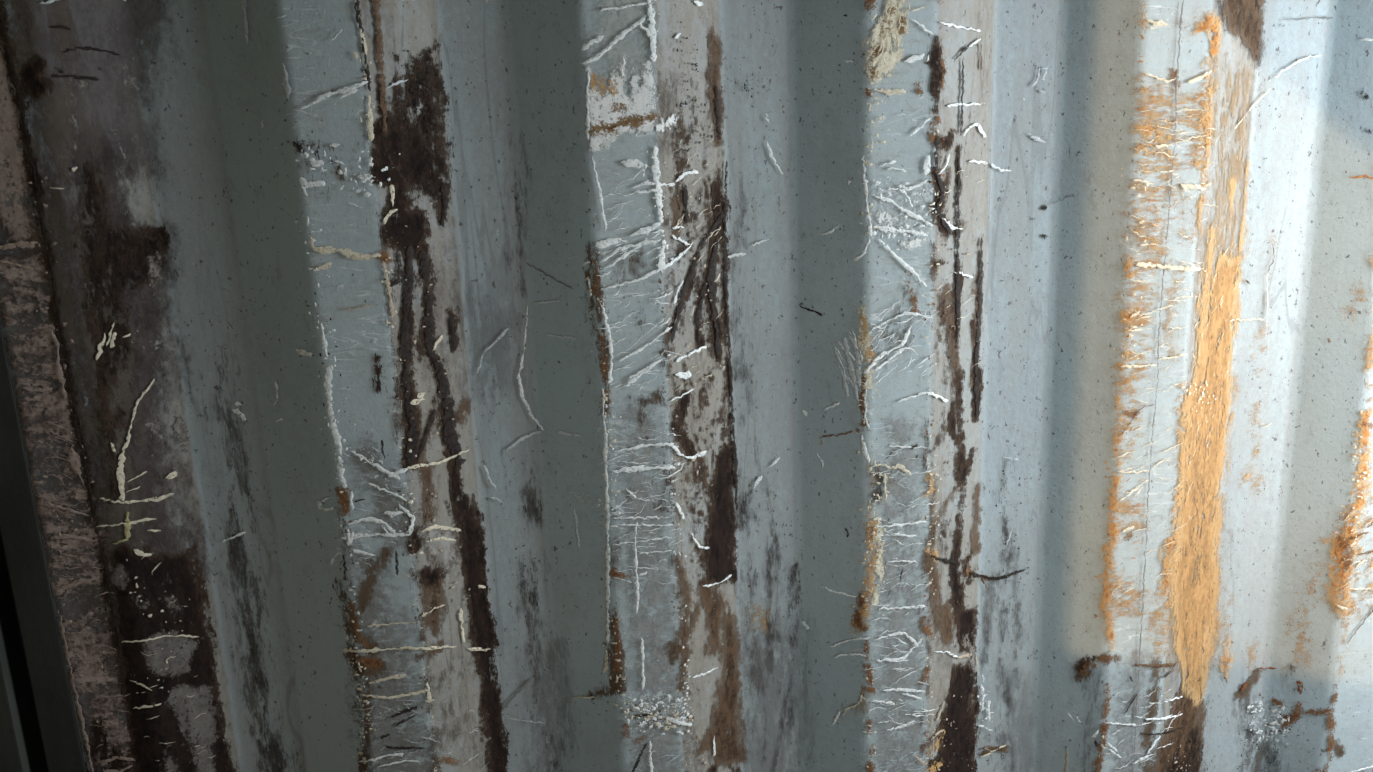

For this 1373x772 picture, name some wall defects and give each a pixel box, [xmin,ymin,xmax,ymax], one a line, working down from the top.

rust [50,141,237,772]
rust [317,456,354,518]
rust [335,0,510,772]
rust [573,157,641,702]
rust [629,21,747,772]
rust [842,504,888,772]
peeling [847,0,946,404]
peeling [868,414,938,508]
peeling [918,515,937,771]
rust [856,114,1011,772]
rust [1068,0,1373,772]